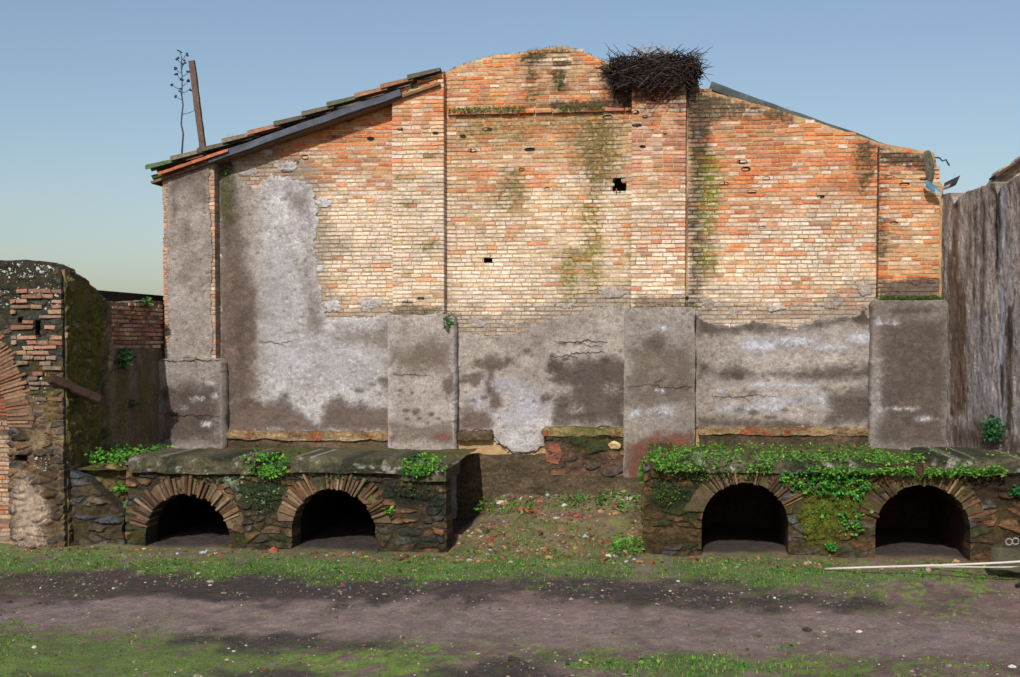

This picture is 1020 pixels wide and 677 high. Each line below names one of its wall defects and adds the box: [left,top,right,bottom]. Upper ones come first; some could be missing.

flaking render [233,106,424,320]
damp [161,162,690,443]
damp [633,86,792,308]
damp [698,189,1020,452]
damp [857,142,926,192]